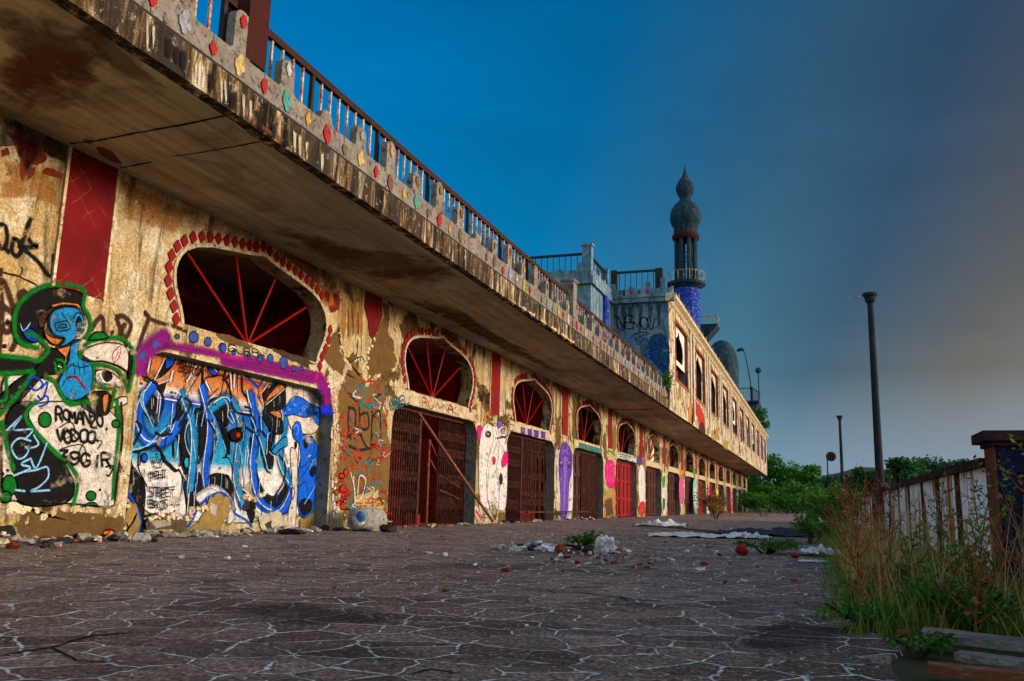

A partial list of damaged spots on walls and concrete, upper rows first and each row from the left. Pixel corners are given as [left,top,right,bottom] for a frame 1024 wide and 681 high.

leakage [4,19,148,107]
crack [68,115,225,144]
peeling [1,137,64,182]
crack [120,141,262,168]
leakage [279,233,433,307]
flaking render [216,333,253,349]
leakage [412,302,555,370]
leakage [510,299,574,345]
flaking render [271,303,397,525]
flaking render [0,490,267,542]
flaking render [258,511,315,531]
crack [1,632,133,663]